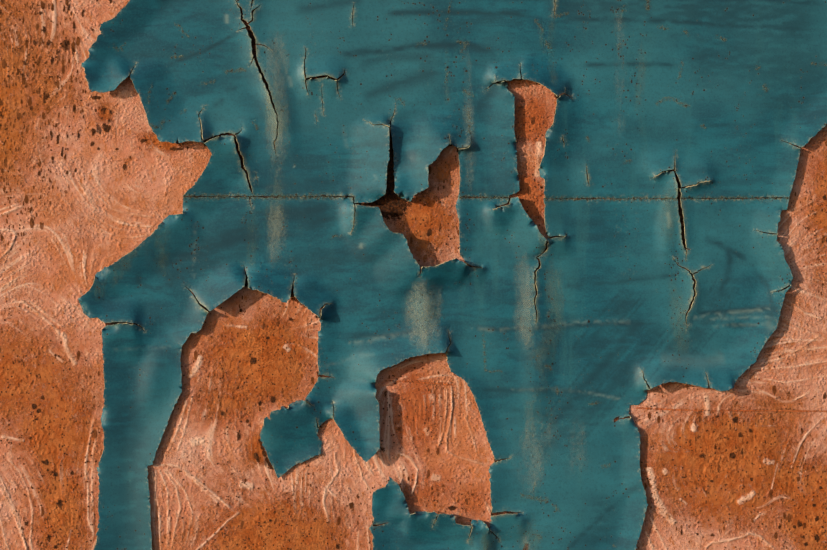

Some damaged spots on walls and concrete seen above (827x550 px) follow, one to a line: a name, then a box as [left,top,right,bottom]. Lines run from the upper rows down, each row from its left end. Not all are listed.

rust [0,300,103,550]
rust [0,0,117,254]
peeling [0,0,244,550]
crack [198,107,258,208]
crack [236,0,279,154]
rust [155,287,372,550]
crack [300,48,345,121]
peeling [133,263,530,550]
peeling [334,115,477,297]
crack [639,147,720,325]
peeling [615,91,827,550]
rust [629,379,827,550]